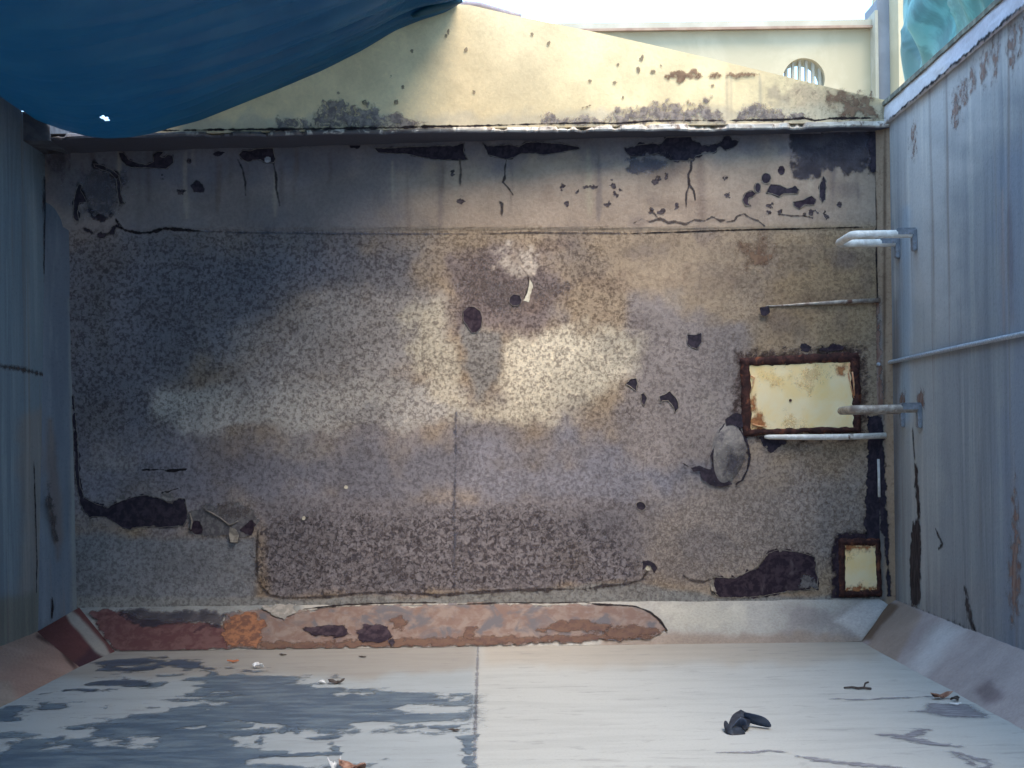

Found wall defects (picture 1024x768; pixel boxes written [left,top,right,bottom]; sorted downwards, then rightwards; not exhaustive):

corrosion [665,69,755,83]
corrosion [951,17,1024,128]
spalling [541,84,809,214]
crack [488,182,878,298]
peeling [723,166,842,220]
corrosion [732,303,884,443]
peeling [71,396,188,530]
corrosion [89,504,668,651]
peeling [710,548,819,599]
corrosion [829,532,880,598]